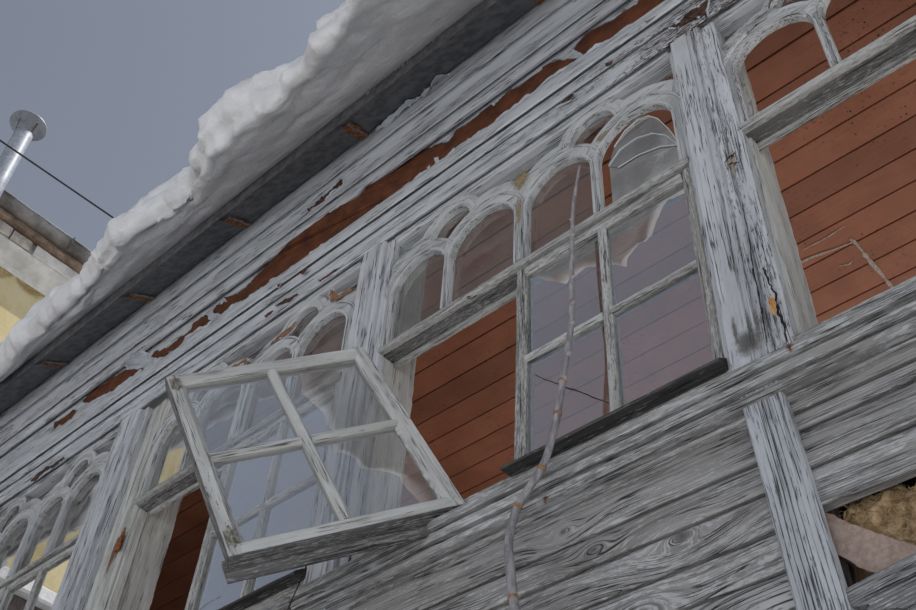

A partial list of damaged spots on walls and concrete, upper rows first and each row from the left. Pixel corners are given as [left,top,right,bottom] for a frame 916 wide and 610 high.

peeling [53,0,665,430]
crack [742,202,788,343]